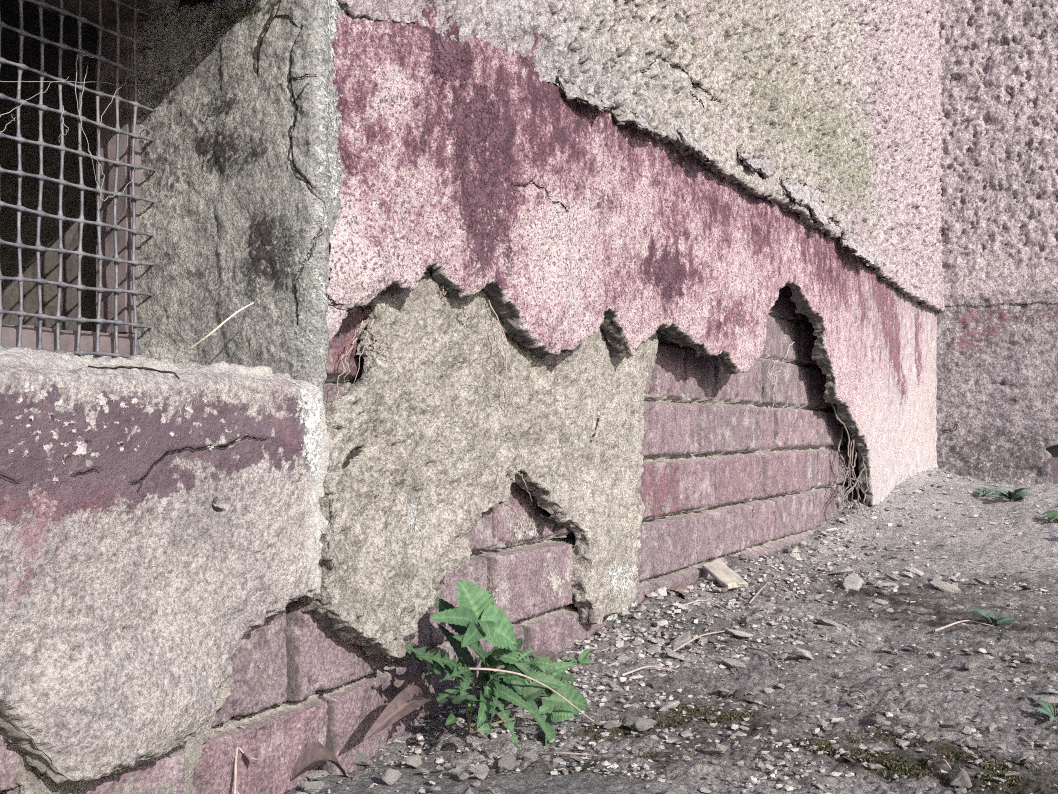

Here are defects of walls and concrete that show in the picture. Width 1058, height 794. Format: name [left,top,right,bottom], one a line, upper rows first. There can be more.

flaking render [556,74,660,135]
crack [254,0,328,325]
water stain [418,31,520,278]
flaking render [676,127,714,164]
crack [511,182,569,212]
flaking render [736,147,877,266]
crack [326,294,363,313]
water stain [838,249,923,403]
crack [88,365,180,379]
crack [130,435,267,492]
flaking render [0,269,859,794]